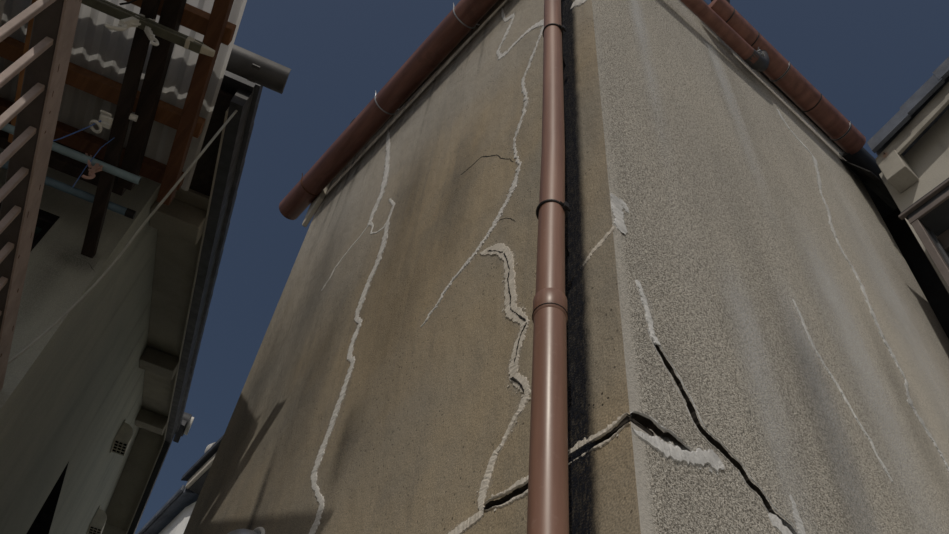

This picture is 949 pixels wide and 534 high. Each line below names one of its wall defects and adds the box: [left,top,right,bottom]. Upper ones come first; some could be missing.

crack [571,0,587,8]
crack [309,129,395,534]
crack [420,8,544,534]
crack [583,226,615,266]
crack [568,280,806,534]